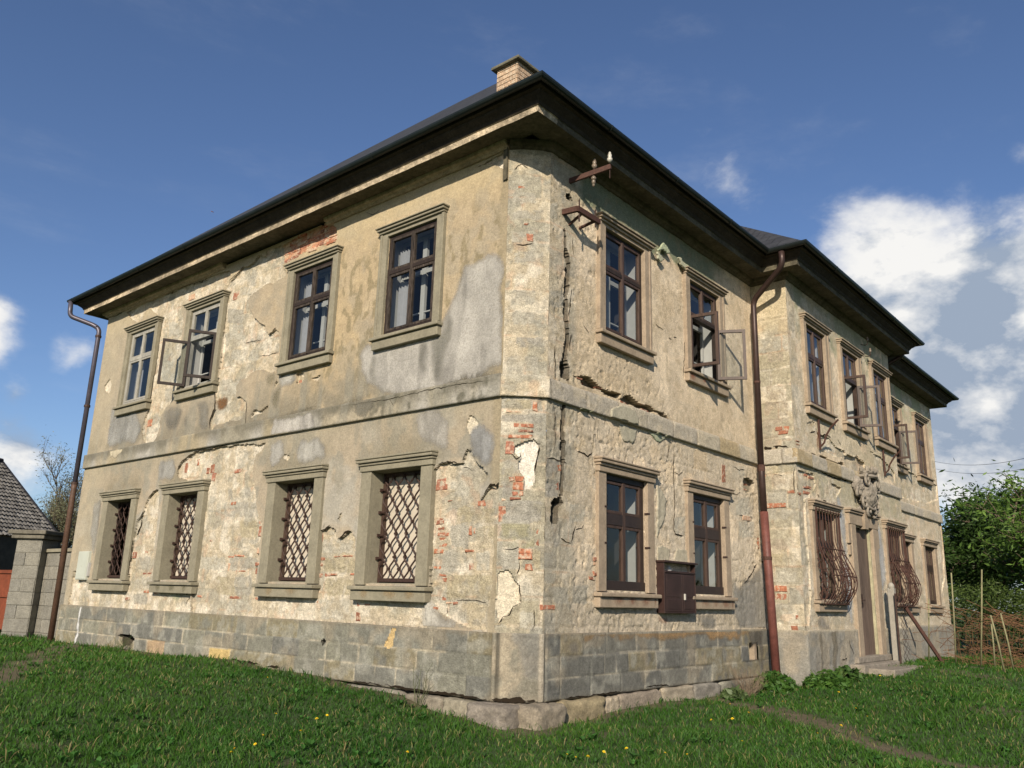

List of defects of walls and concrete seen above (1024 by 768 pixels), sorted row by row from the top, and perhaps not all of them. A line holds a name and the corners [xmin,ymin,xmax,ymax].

peeling [127,224,337,443]
crack [513,228,596,496]
flaking render [466,415,478,434]
flaking render [505,401,537,455]
peeling [611,401,671,443]
peeling [68,442,524,632]
flaking render [518,530,539,571]